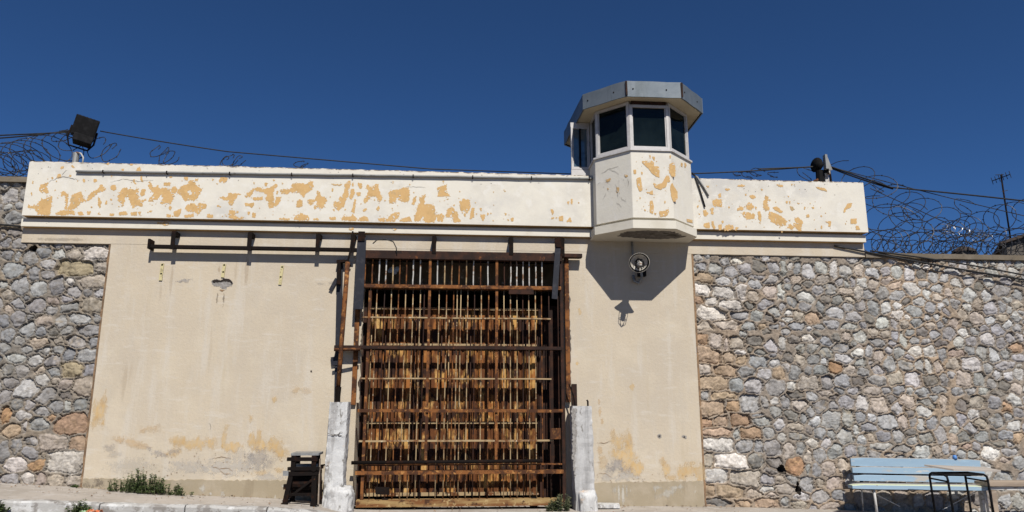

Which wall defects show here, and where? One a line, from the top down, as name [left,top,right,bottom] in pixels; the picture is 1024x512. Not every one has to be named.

peeling [28,162,492,231]
peeling [625,155,687,217]
peeling [687,184,831,233]
spalling [211,278,233,292]
water stain [169,416,289,495]
water stain [606,432,644,504]